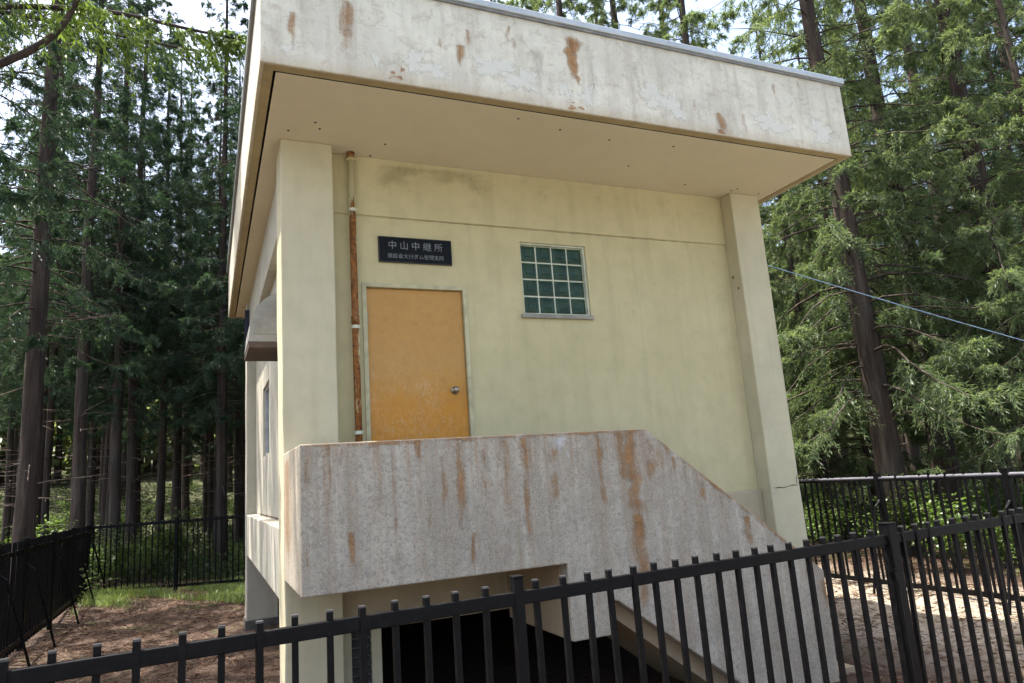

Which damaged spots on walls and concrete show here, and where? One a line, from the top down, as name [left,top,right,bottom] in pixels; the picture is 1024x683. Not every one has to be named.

rust [564,38,580,83]
rust [568,429,654,572]